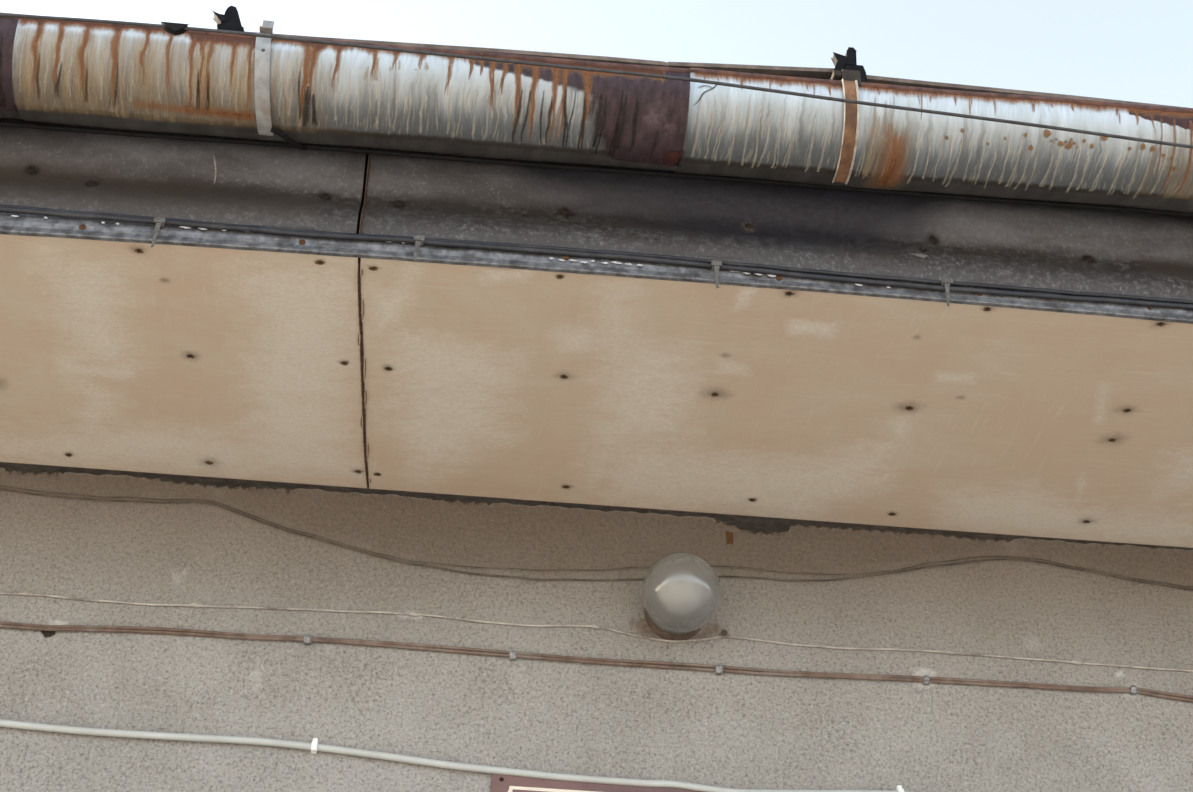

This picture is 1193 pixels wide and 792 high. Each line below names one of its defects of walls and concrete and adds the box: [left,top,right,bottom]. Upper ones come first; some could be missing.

rust [0,18,256,124]
rust [271,40,427,127]
rust [441,54,843,166]
rust [858,86,1193,195]